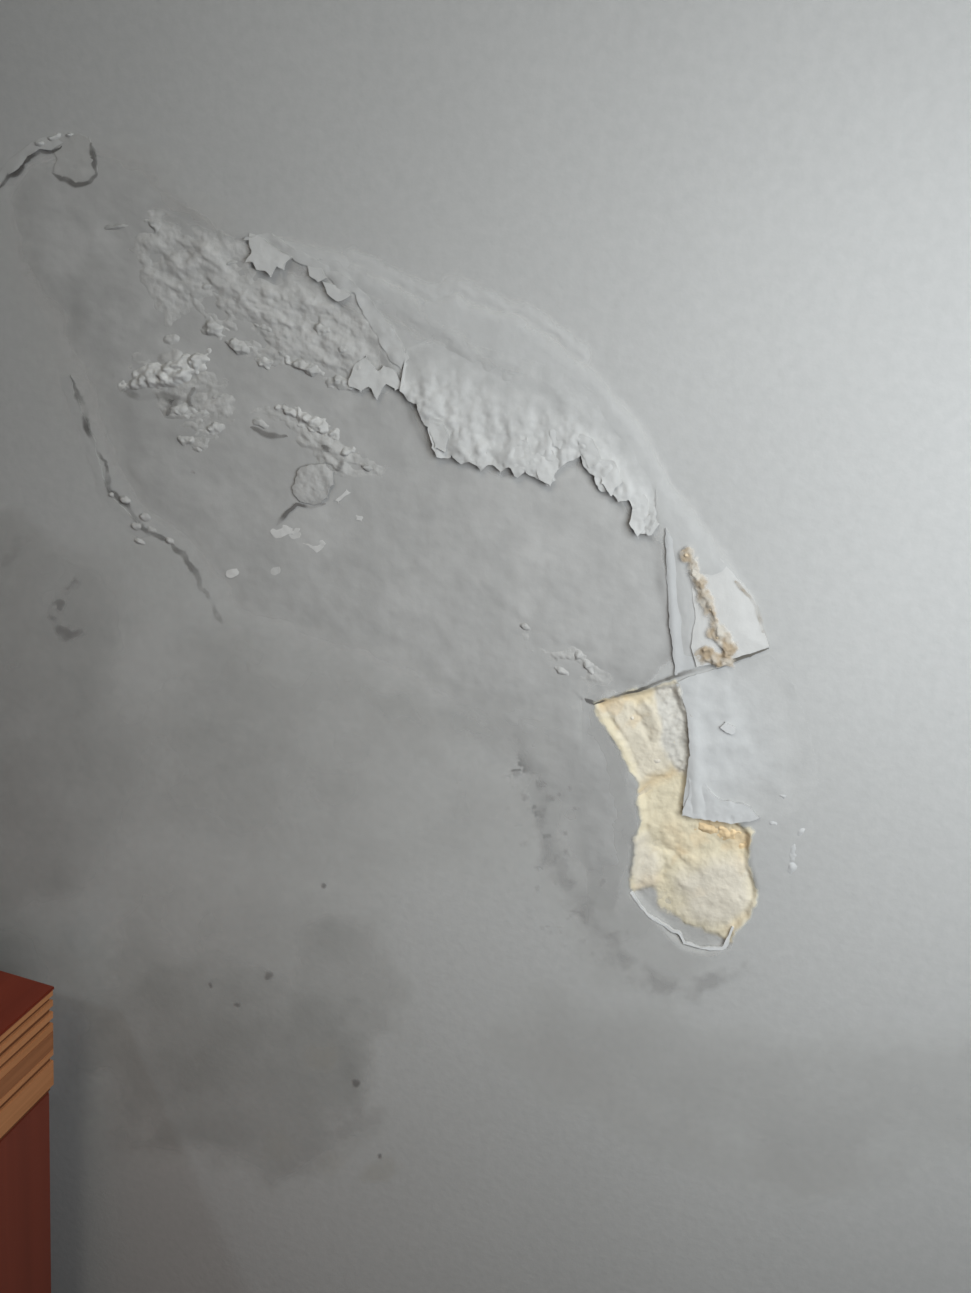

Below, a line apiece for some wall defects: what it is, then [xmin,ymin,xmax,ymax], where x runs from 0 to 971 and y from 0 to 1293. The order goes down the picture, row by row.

crack [56,375,174,545]
peeling [0,133,819,956]
damp [0,575,134,978]
damp [92,919,370,1176]